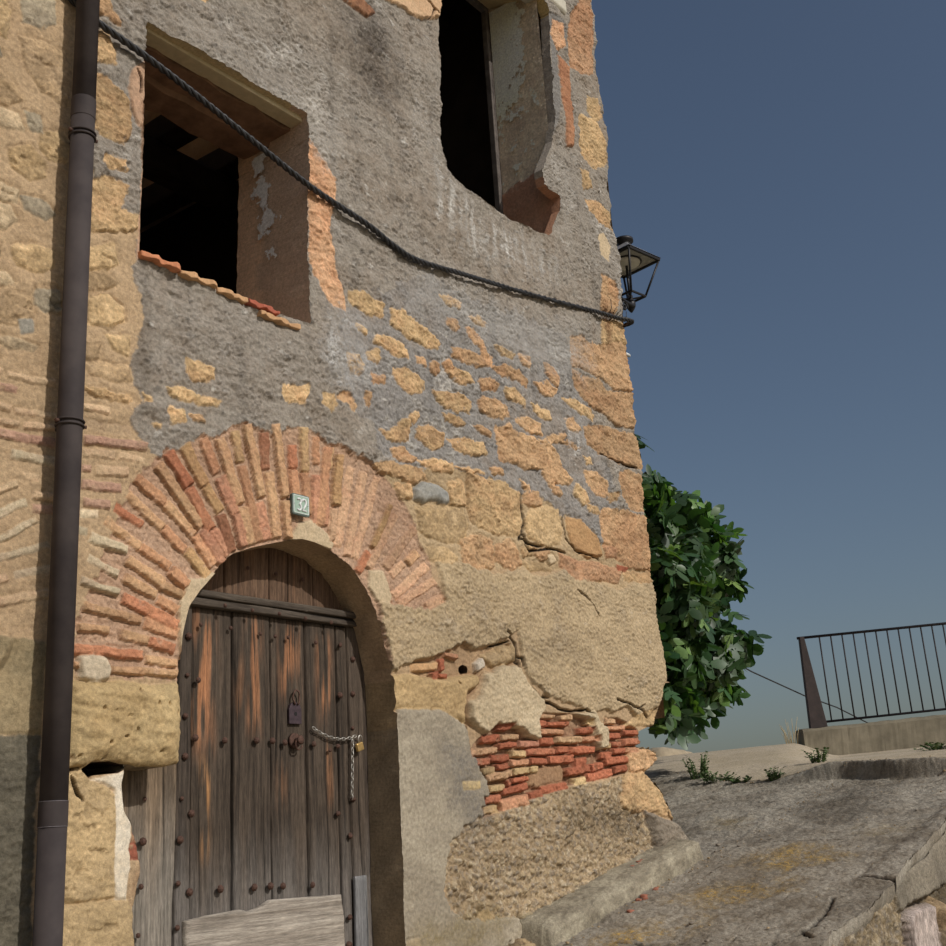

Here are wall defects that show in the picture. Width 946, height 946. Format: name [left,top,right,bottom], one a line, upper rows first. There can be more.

peeling [387,0,442,20]
crack [427,0,440,21]
spalling [489,0,613,262]
spalling [152,355,223,430]
spalling [282,138,653,585]
crack [518,496,599,560]
crack [577,588,601,616]
crack [487,628,526,667]
crack [532,687,595,714]
crack [616,697,657,718]
spalling [409,641,689,922]
peeling [81,761,138,900]